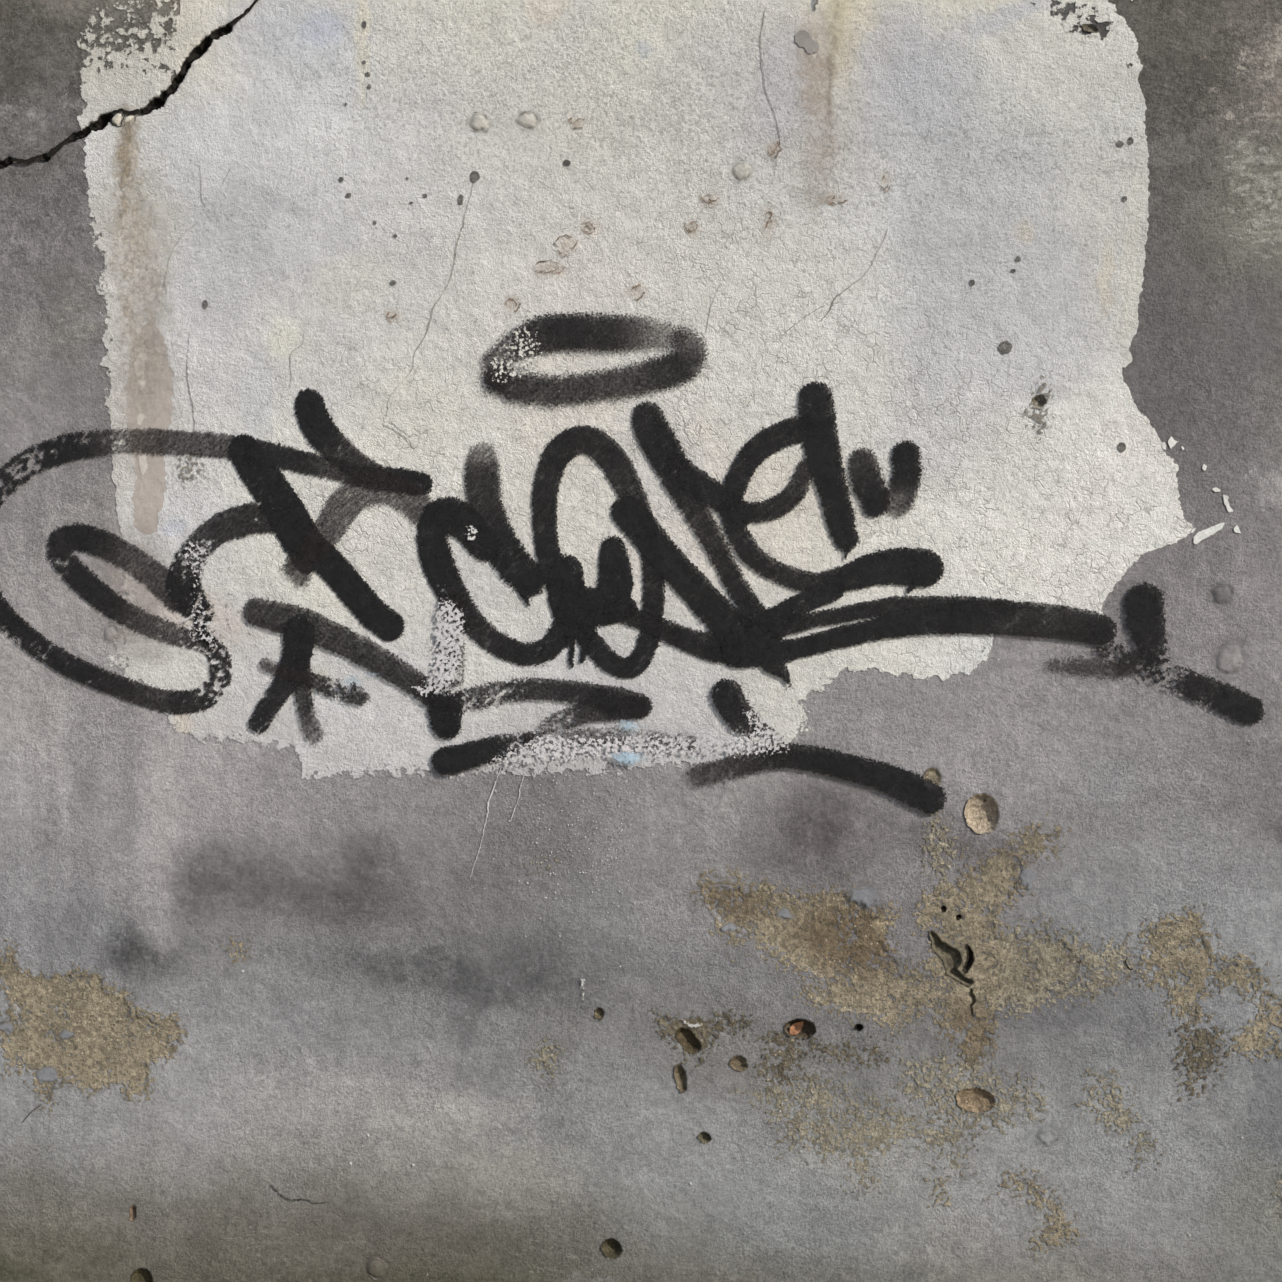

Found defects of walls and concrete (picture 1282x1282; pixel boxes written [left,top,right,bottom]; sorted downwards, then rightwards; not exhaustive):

crack [0,0,258,167]
damp [114,119,145,278]
crack [164,165,232,293]
crack [386,182,474,449]
peeling [0,939,194,1118]
peeling [648,794,1282,1261]